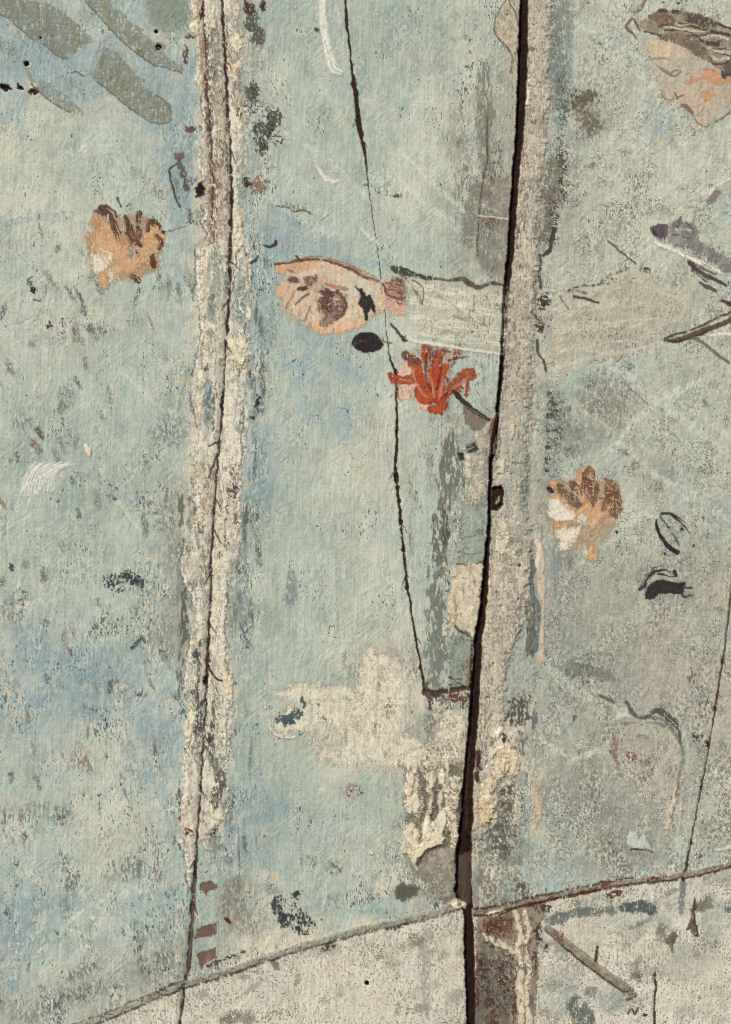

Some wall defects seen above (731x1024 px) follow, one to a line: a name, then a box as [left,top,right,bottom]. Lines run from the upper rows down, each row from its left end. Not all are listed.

crack [199,733,212,796]
peeling [175,0,253,889]
crack [199,0,240,730]
crack [73,796,466,1024]
crack [344,0,381,276]
peeling [262,0,574,902]
corrosion [474,903,551,1024]
crack [386,0,731,1024]